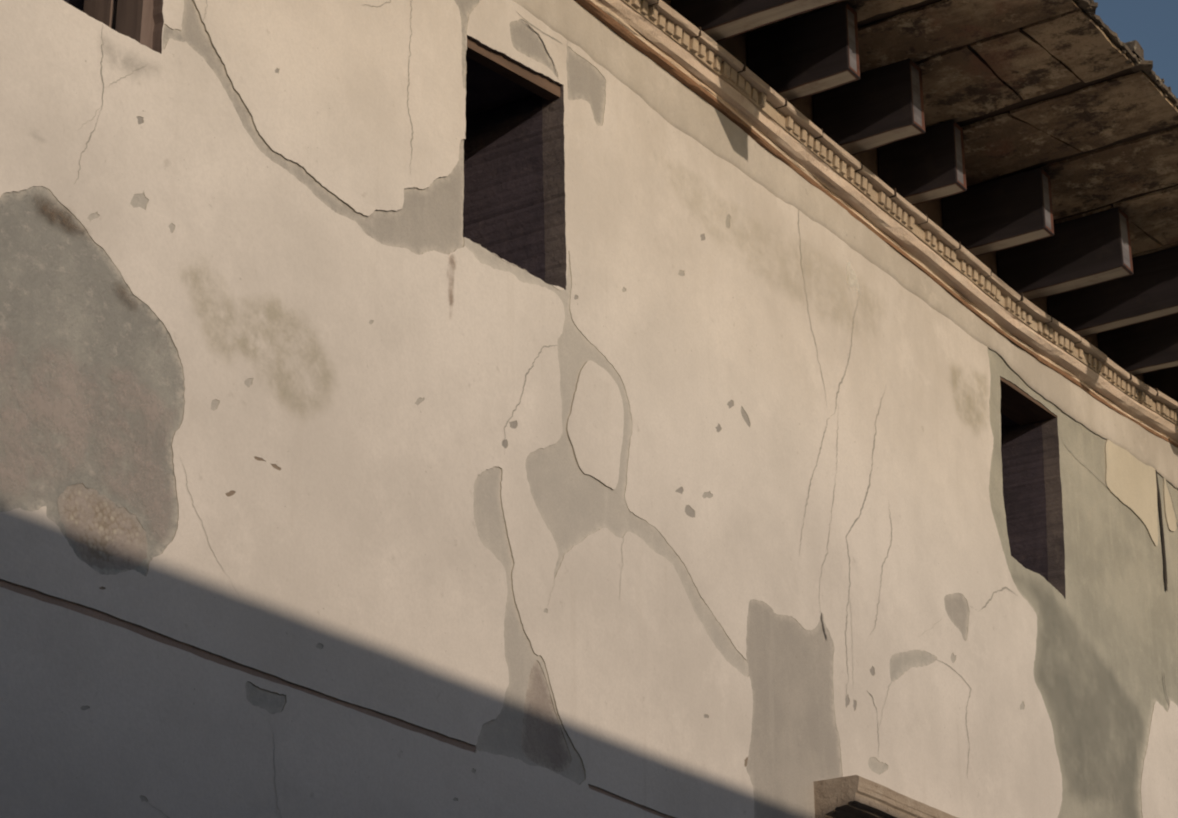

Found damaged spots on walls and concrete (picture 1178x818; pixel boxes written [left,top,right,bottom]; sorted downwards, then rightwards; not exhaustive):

crack [74,24,146,184]
crack [365,0,414,173]
spalling [0,186,185,576]
peeling [162,0,857,818]
crack [798,212,894,751]
crack [935,659,971,779]
peeling [988,348,1178,818]